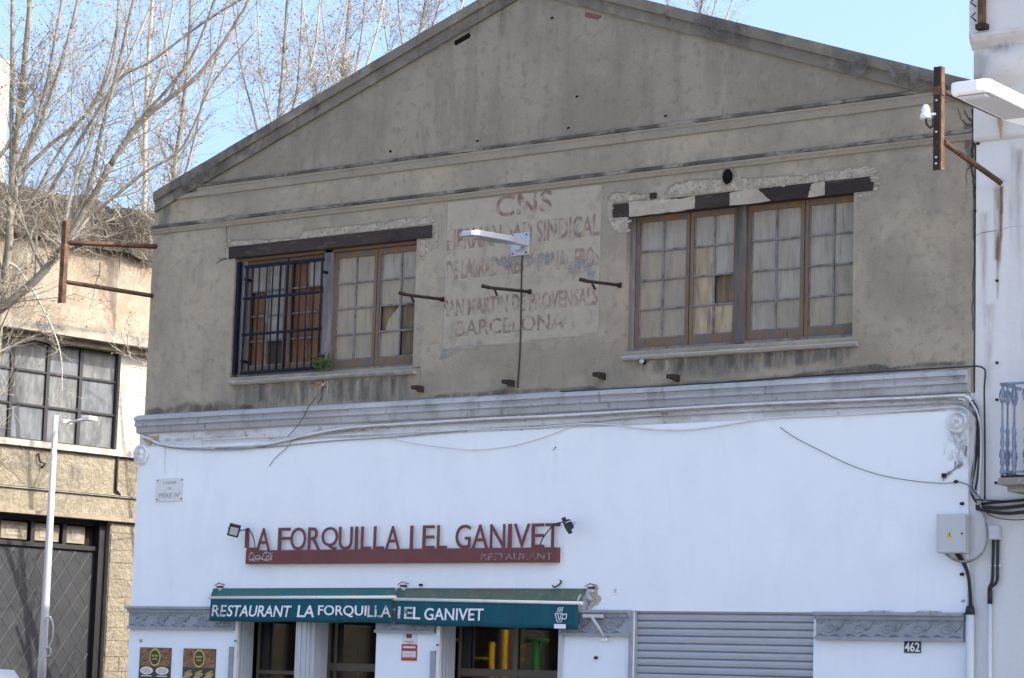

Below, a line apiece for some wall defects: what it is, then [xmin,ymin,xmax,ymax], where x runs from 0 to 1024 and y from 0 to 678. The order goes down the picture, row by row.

spalling [607,165,880,233]
water stain [655,350,899,376]